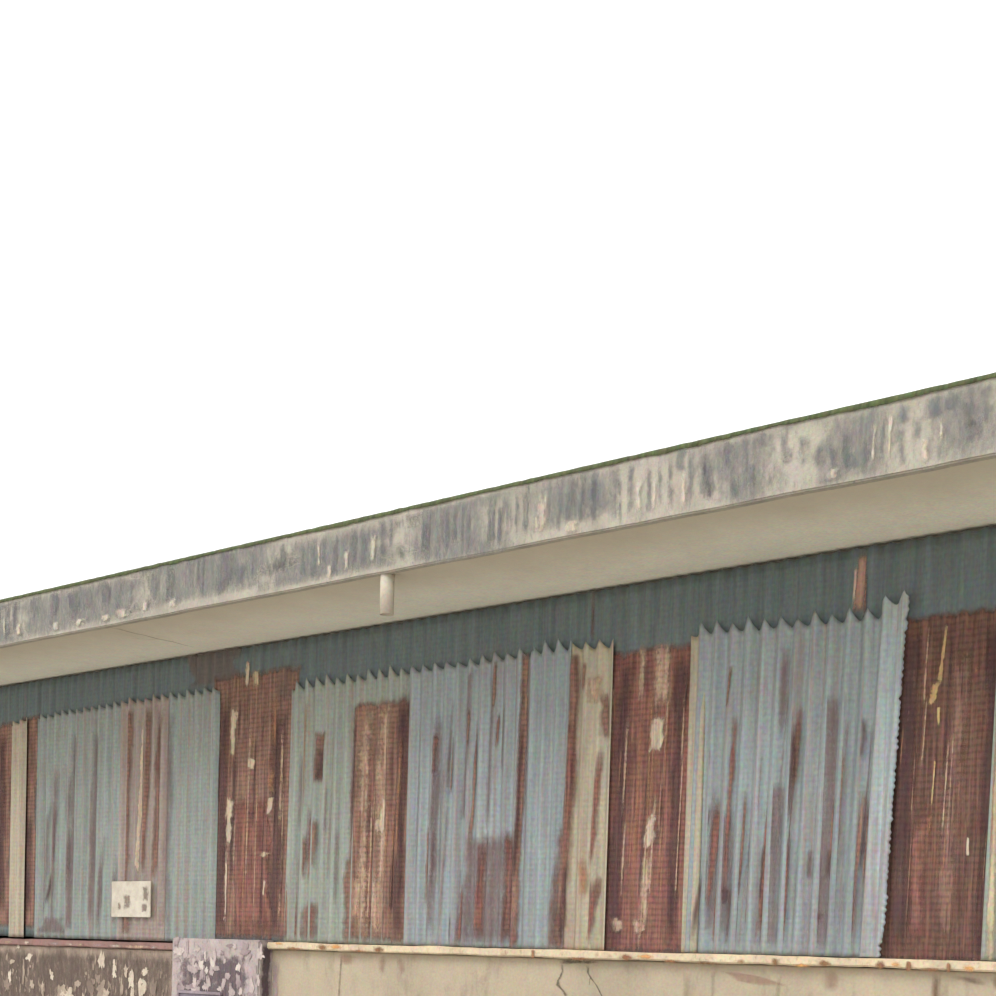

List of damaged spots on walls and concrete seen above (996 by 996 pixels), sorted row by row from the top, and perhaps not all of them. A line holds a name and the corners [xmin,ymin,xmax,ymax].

leakage [0,525,401,640]
leakage [410,469,633,559]
leakage [647,434,765,499]
leakage [817,410,883,474]
rust [0,716,75,931]
rust [214,663,453,952]
rust [448,656,529,946]
rust [548,644,691,962]
rust [694,665,802,939]
rust [876,608,996,972]
peeling [0,937,271,996]
crack [556,960,602,996]